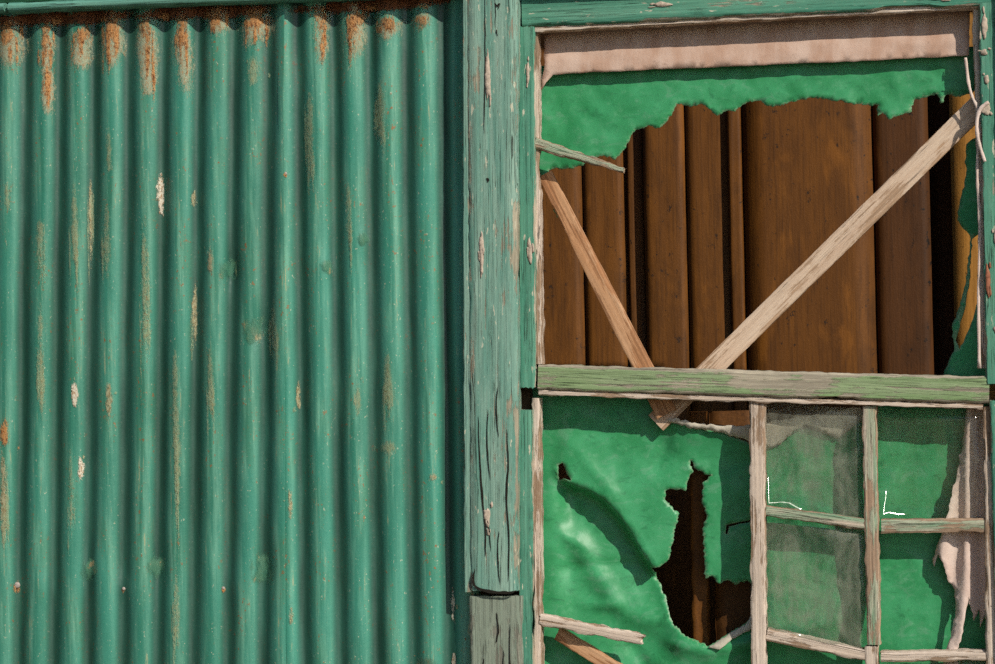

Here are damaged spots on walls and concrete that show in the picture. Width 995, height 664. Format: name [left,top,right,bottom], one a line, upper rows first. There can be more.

rust [0,4,275,114]
rust [290,0,450,66]
crack [472,357,517,664]